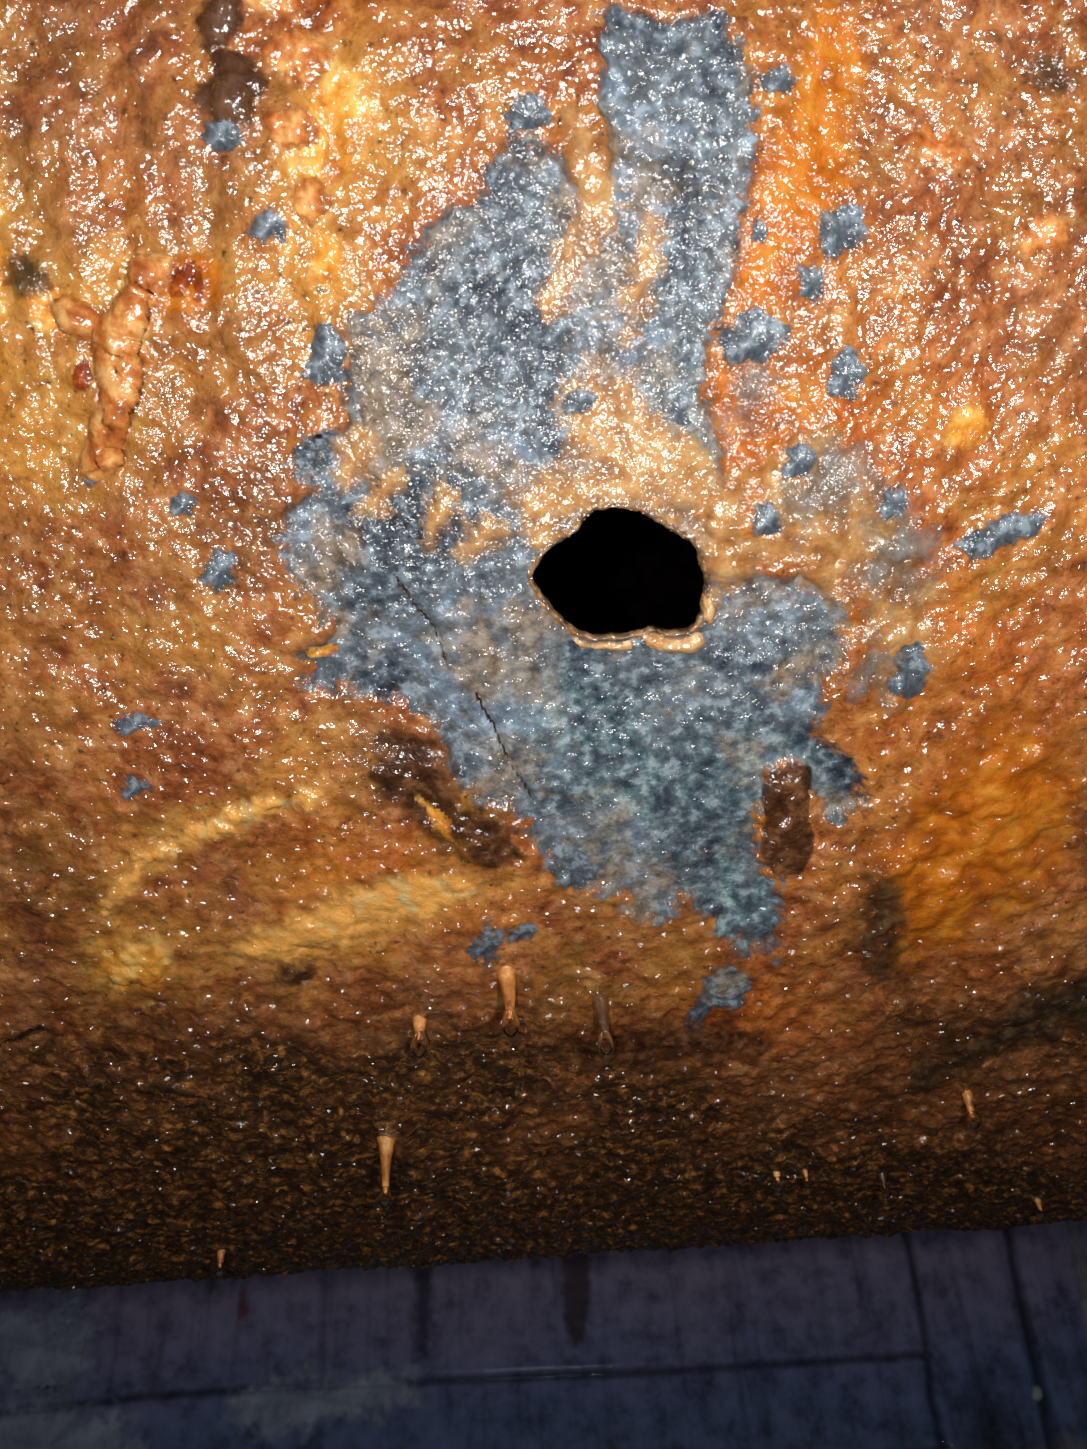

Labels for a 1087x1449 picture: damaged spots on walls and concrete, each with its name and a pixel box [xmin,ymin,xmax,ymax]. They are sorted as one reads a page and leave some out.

rust [0,242,223,483]
rust [944,405,991,451]
rust [233,0,947,1074]
peeling [573,596,716,654]
rust [97,785,325,918]
rust [861,725,1081,962]
rust [93,937,172,995]
water stain [862,875,905,974]
water stain [910,976,1087,1093]
rust [962,1090,980,1130]
rust [377,1136,396,1209]
rust [214,1249,225,1278]